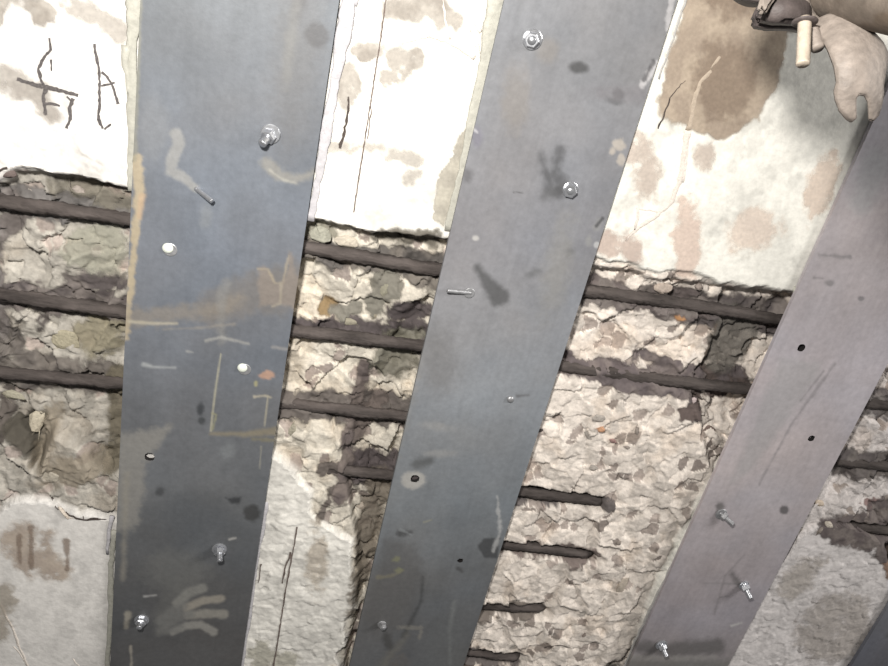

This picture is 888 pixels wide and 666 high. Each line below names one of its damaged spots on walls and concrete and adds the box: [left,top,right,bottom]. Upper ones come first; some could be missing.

leakage [0,0,127,43]
crack [338,0,386,212]
leakage [337,43,424,108]
leakage [371,131,465,249]
crack [658,80,686,129]
leakage [658,0,789,169]
spalling [0,165,132,524]
crack [273,527,298,666]
spalling [272,217,448,666]
leakage [347,478,391,617]
spalling [467,255,793,666]
spalling [776,364,888,575]